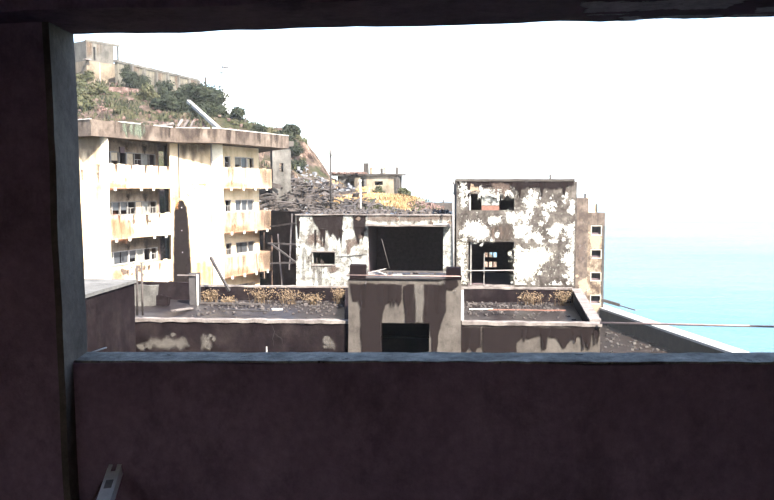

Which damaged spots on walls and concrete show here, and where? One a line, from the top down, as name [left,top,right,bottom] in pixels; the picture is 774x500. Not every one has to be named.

damp [302,213,367,285]
spalling [355,215,452,224]
peeling [439,181,590,293]
peeling [588,231,602,253]
damp [350,283,447,352]
damp [461,326,599,353]